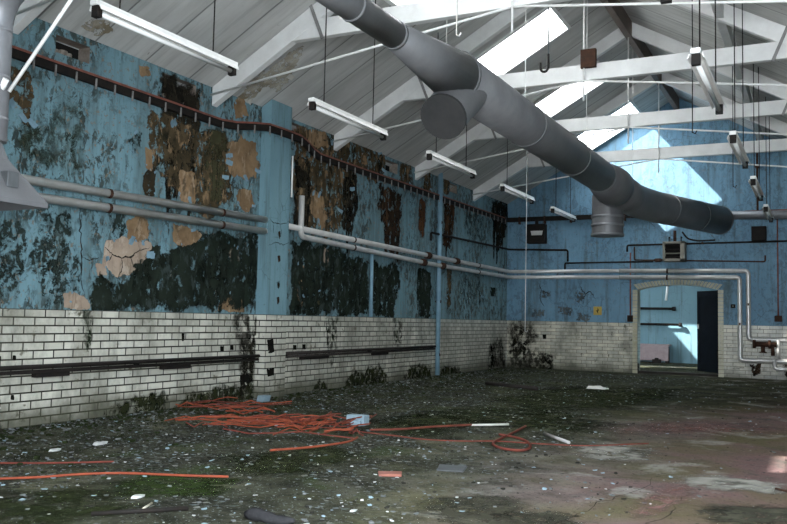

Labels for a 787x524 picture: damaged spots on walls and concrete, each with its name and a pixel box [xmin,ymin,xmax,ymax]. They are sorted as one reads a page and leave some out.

leakage [18,102,83,175]
spalling [95,216,155,278]
leakage [82,229,258,400]
spalling [173,223,202,247]
peeling [128,110,261,219]
peeling [290,125,386,263]
leakage [289,169,402,365]